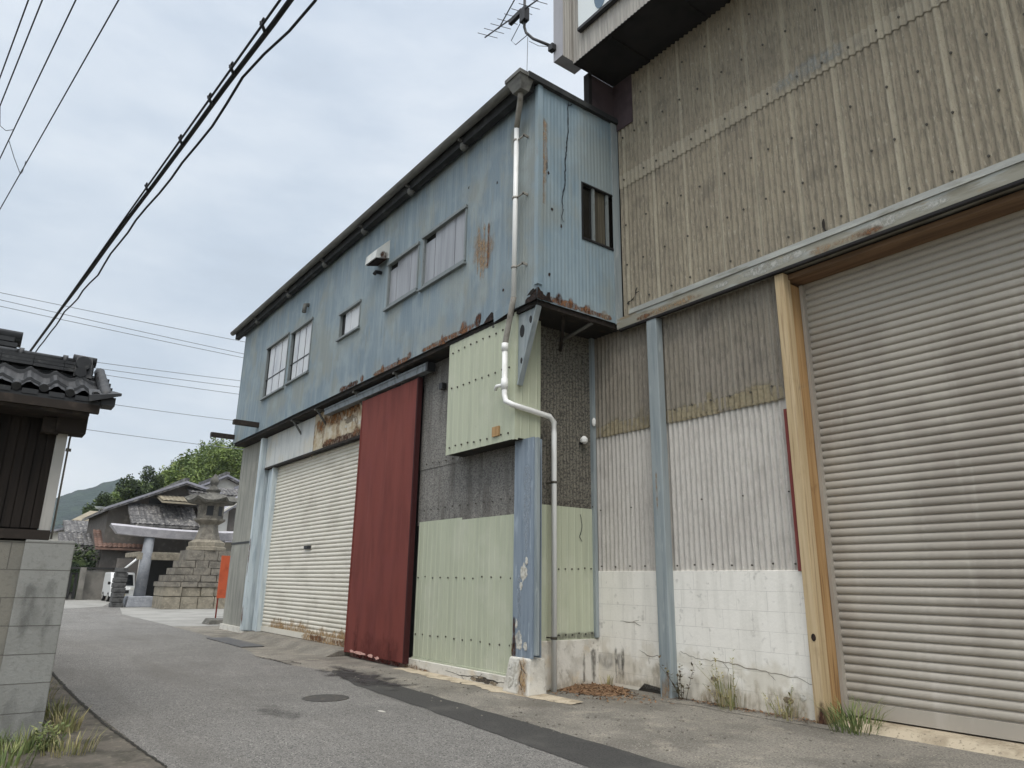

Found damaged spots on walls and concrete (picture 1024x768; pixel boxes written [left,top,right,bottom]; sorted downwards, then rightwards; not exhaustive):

crack [561,102,572,222]
rust [550,294,611,320]
rust [312,404,360,451]
peeling [520,557,528,591]
crack [641,651,812,685]